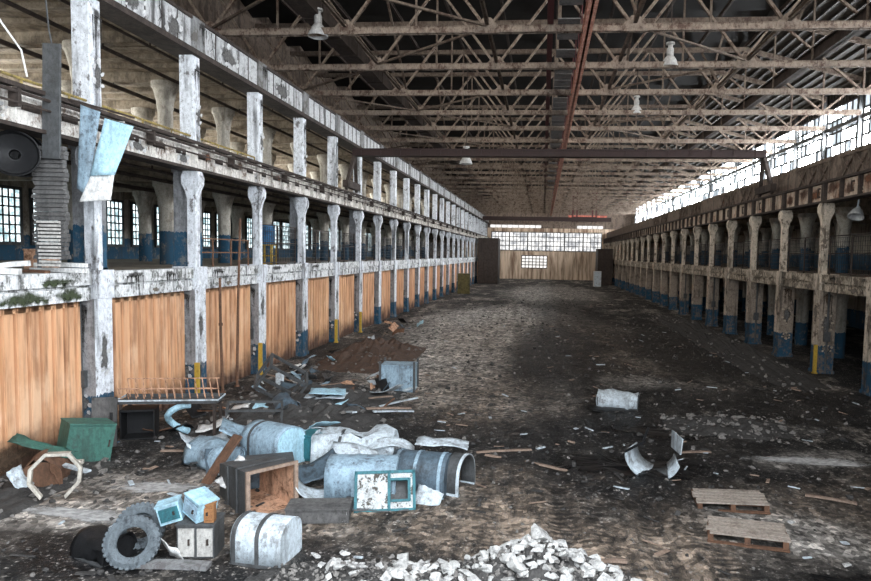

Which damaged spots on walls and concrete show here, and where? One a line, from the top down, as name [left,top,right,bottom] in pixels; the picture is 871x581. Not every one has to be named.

peeling [121,0,147,17]
peeling [164,11,183,40]
peeling [219,43,239,70]
peeling [92,58,105,93]
peeling [275,81,291,101]
water stain [0,283,87,347]
peeling [99,333,111,376]